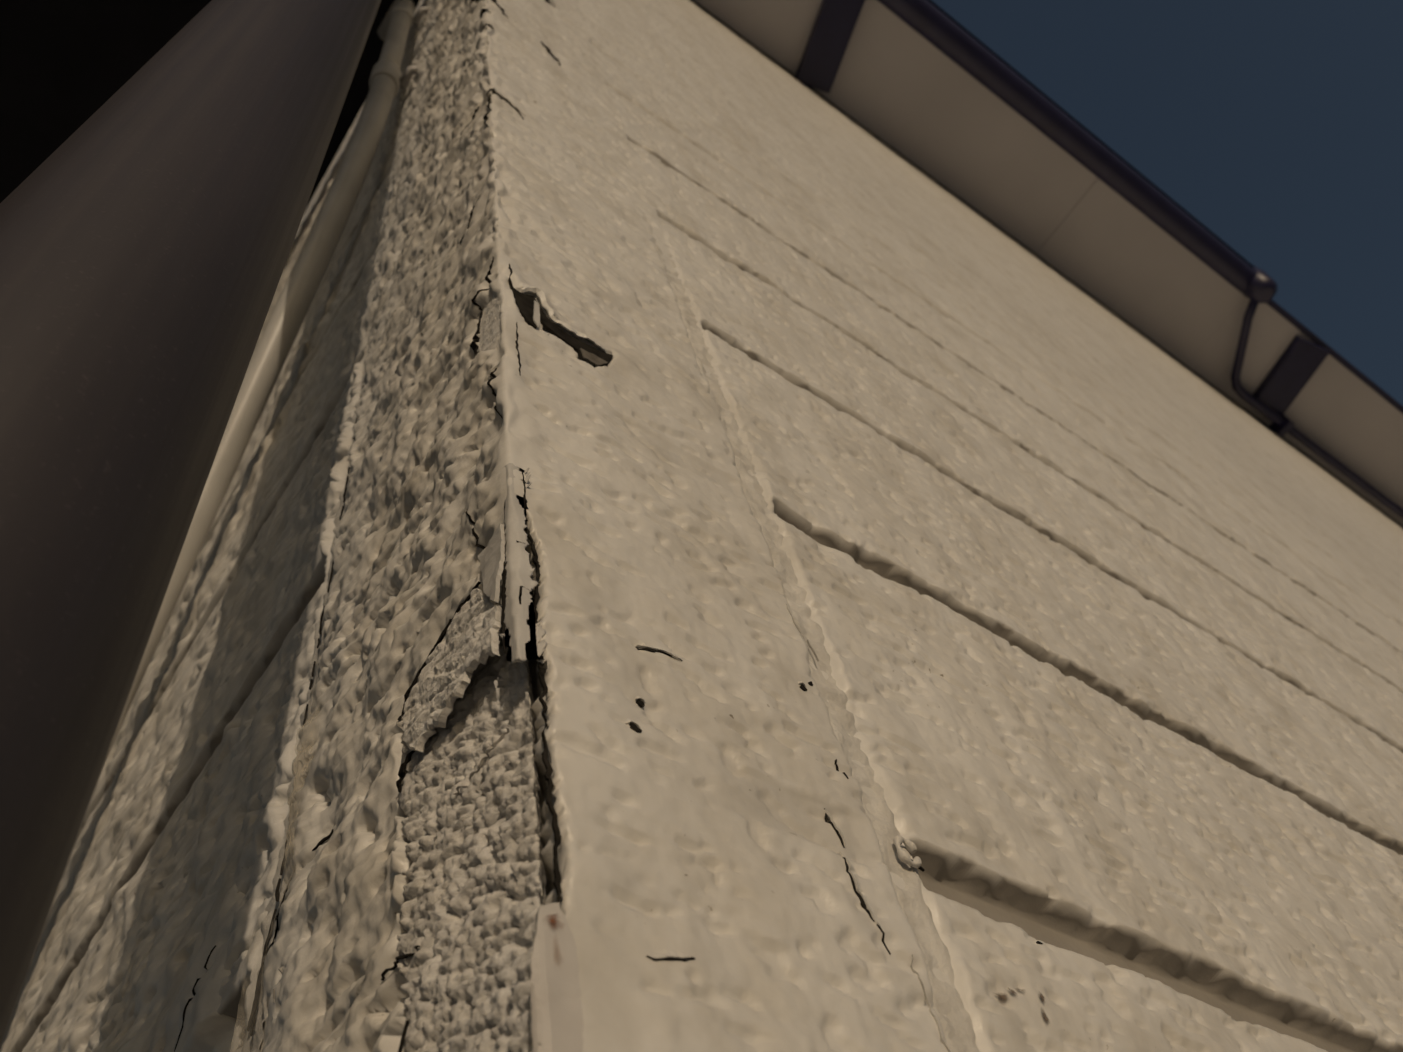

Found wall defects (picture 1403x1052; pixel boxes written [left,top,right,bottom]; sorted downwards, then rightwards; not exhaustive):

crack [492,0,508,18]
crack [483,87,526,127]
crack [540,41,561,66]
peeling [470,257,613,375]
crack [339,385,364,520]
spalling [487,368,503,419]
crack [247,560,334,1036]
spalling [381,463,562,1052]
crack [824,808,950,1052]